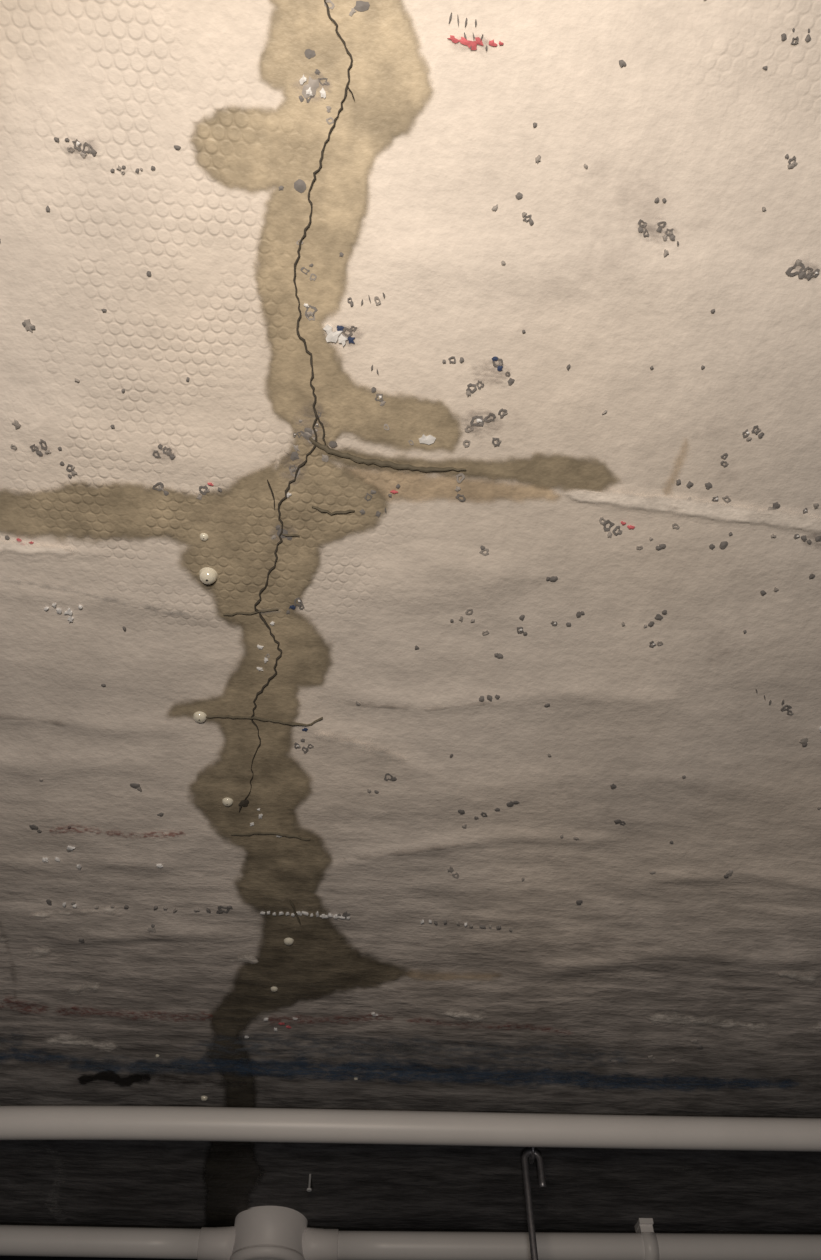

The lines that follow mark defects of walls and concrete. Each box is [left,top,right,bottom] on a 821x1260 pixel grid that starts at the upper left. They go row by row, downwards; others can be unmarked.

water stain [0,0,617,1108]
crack [206,0,466,840]
water stain [203,1141,263,1227]